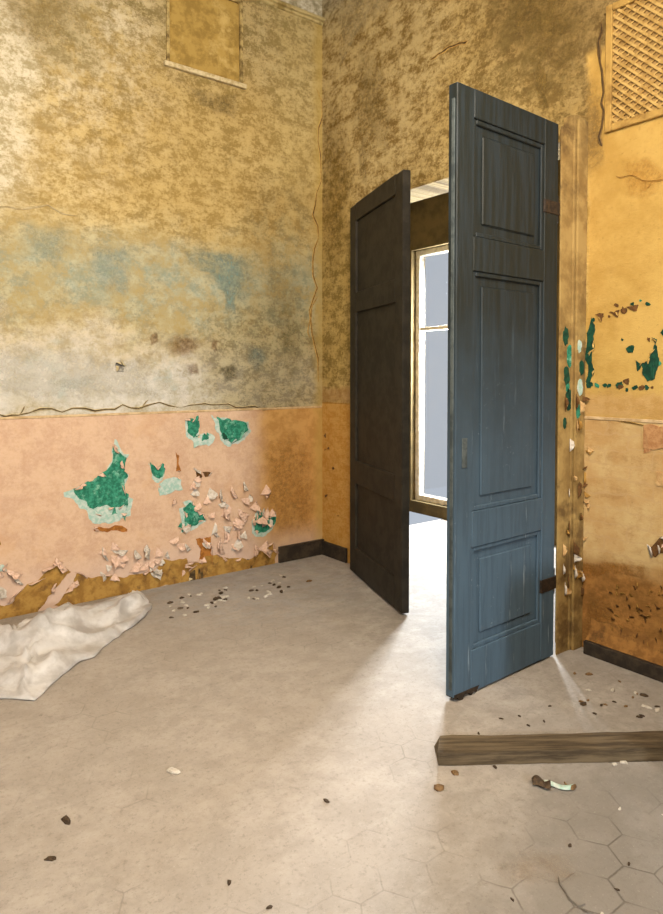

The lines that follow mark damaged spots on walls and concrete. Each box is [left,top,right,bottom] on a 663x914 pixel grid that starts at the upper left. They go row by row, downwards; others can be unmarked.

crack [616,175,663,188]
peeling [563,300,663,454]
crack [0,400,283,417]
peeling [184,413,251,448]
peeling [64,439,133,532]
peeling [0,453,279,619]
peeling [563,466,590,596]
flaking render [647,536,663,558]
peeling [608,583,663,632]
crack [558,876,593,914]